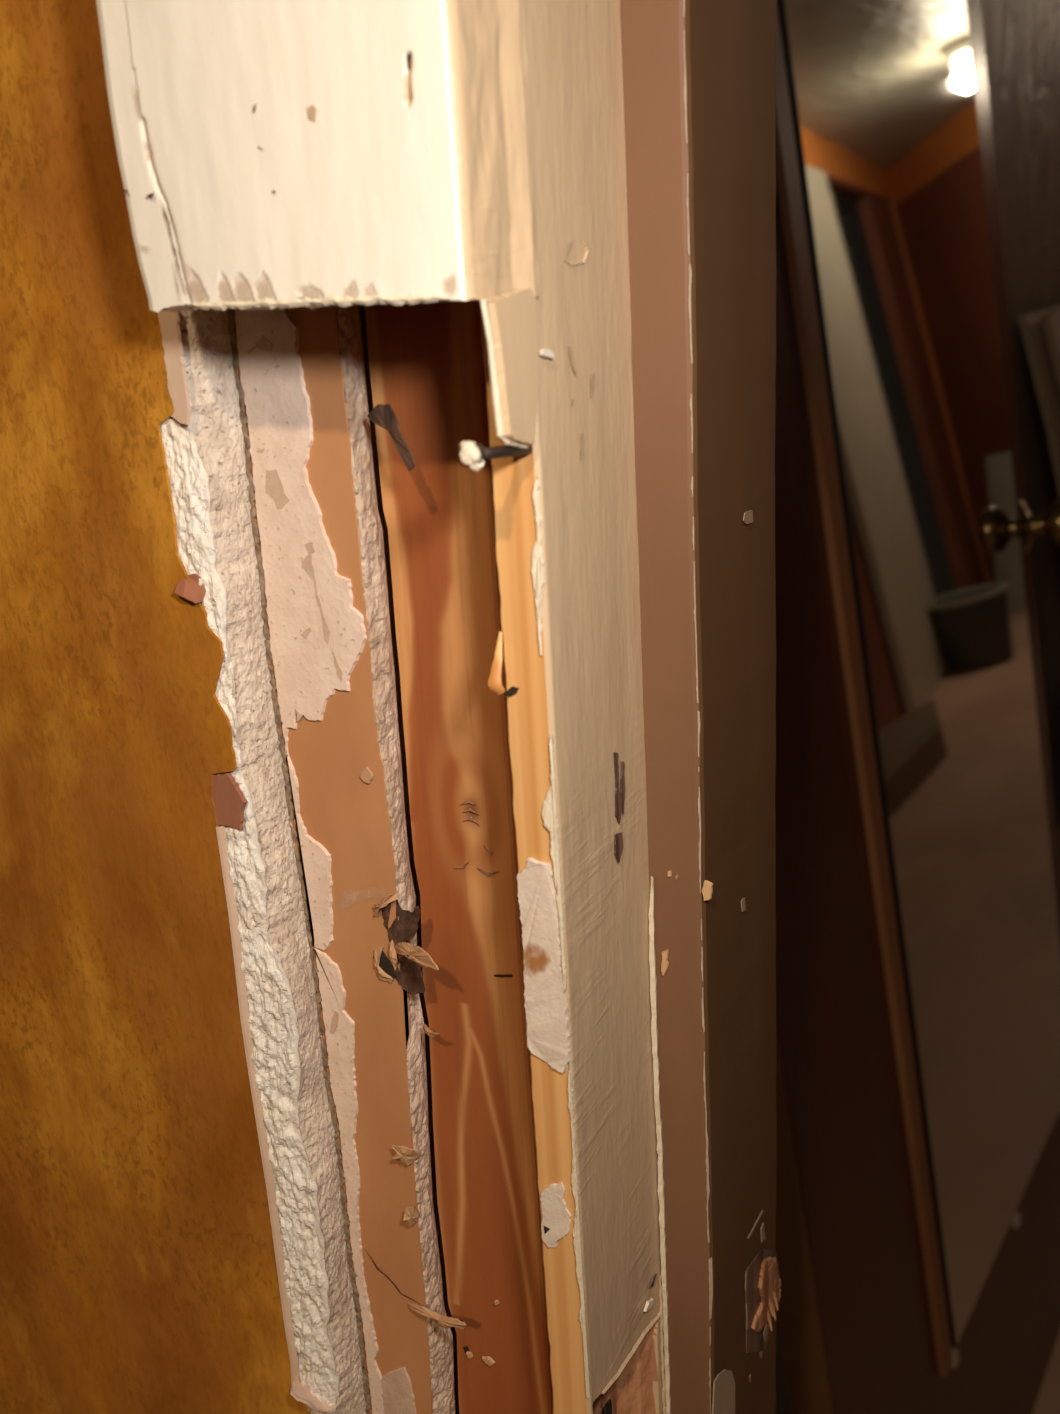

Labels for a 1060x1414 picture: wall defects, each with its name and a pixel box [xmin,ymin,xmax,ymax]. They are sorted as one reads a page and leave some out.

spalling [743,510,753,524]
spalling [157,297,466,1414]
spalling [542,732,567,989]
peeling [692,516,713,901]
peeling [703,1052,751,1414]
spalling [748,1210,765,1243]